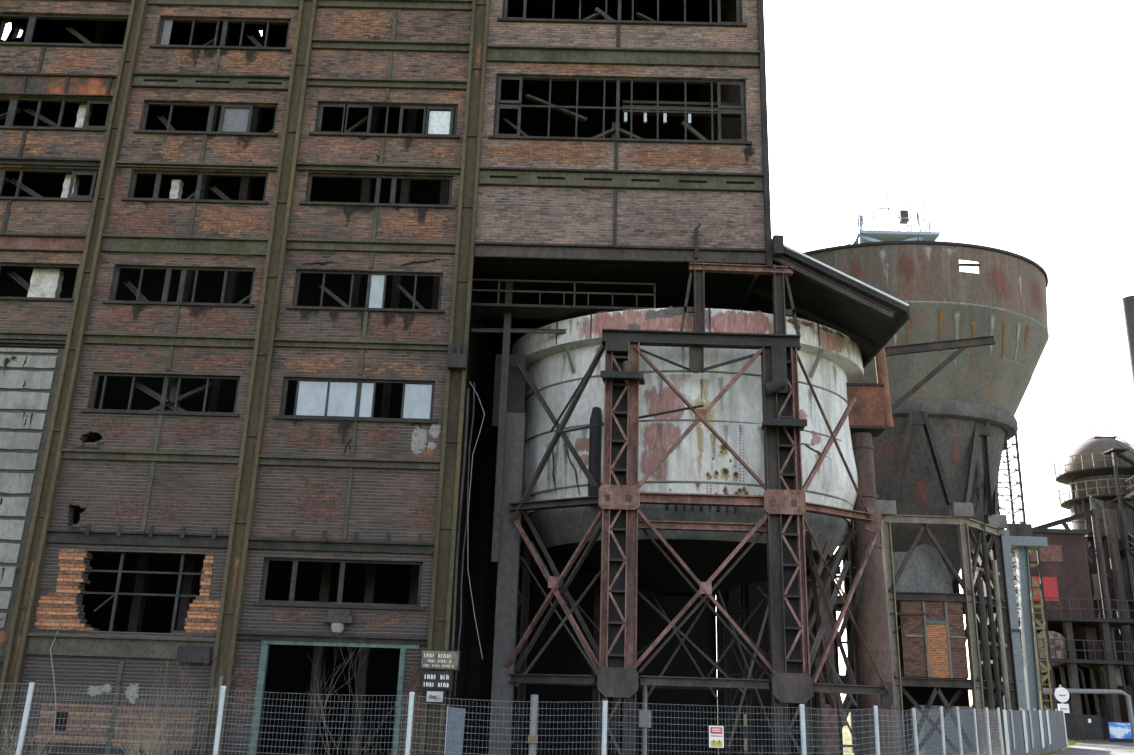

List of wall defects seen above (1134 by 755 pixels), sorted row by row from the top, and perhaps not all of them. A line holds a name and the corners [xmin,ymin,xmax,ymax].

flaking render [411,423,441,458]
rust [690,380,748,495]
flaking render [35,549,93,631]
flaking render [184,556,220,634]